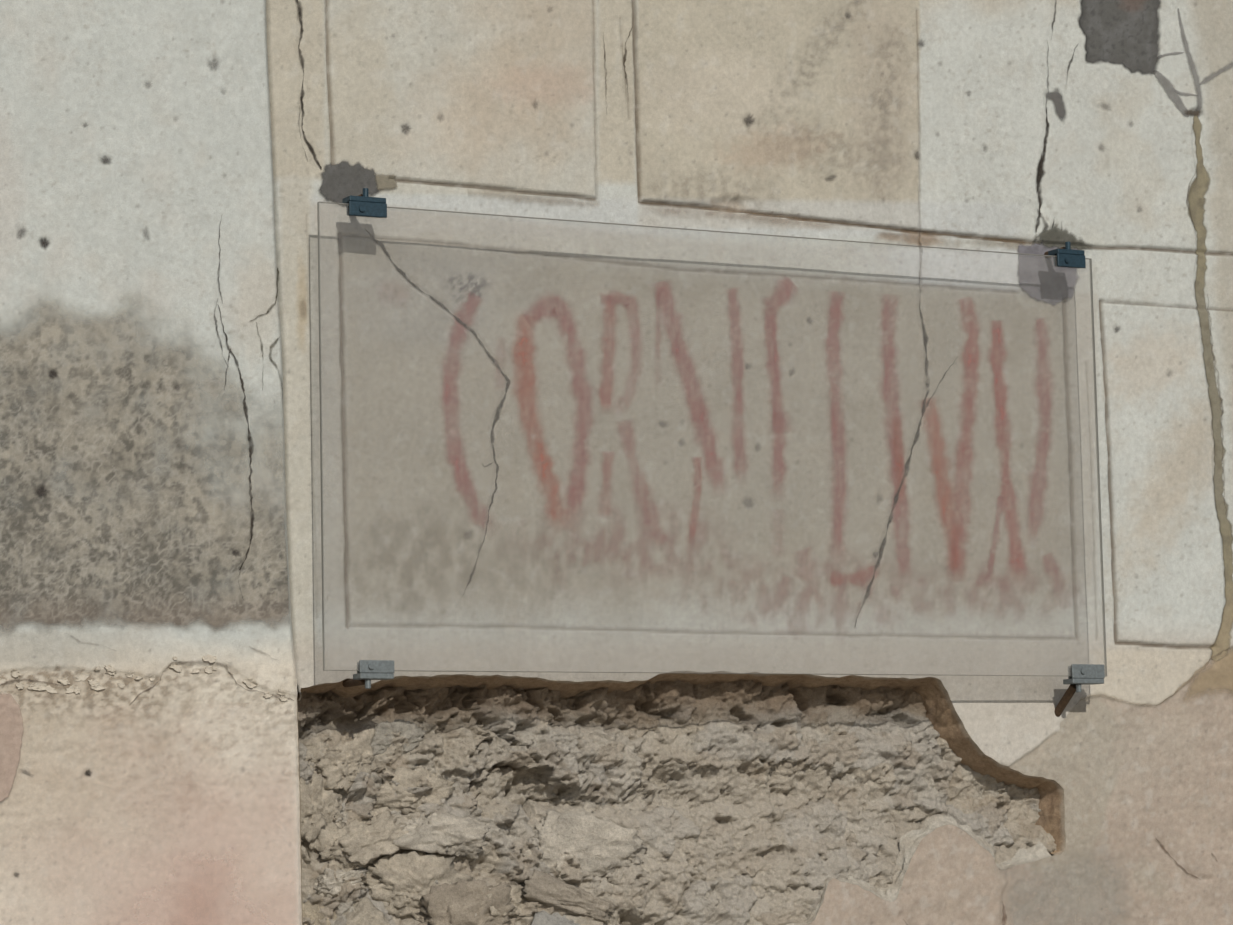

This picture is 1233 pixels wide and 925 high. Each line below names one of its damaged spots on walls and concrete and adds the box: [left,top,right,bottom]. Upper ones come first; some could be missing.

crack [296,0,322,169]
crack [1036,102,1055,232]
crack [214,216,283,598]
crack [365,229,510,596]
crack [855,305,948,627]
crack [1154,8,1233,661]
peeling [0,665,156,696]
spalling [243,671,1066,925]